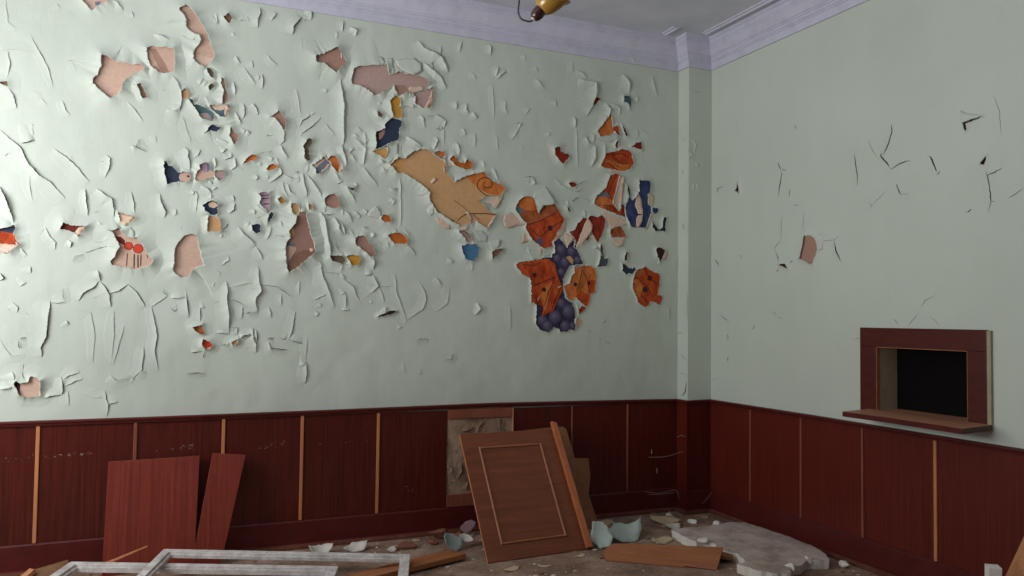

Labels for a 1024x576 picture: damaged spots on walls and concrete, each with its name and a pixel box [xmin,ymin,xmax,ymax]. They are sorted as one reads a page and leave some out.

peeling [0,0,670,383]
crack [775,162,790,198]
crack [850,124,940,210]
crack [964,163,1023,213]
peeling [775,225,825,274]
crack [831,240,841,263]
peeling [0,300,64,408]
flaking render [446,417,512,495]